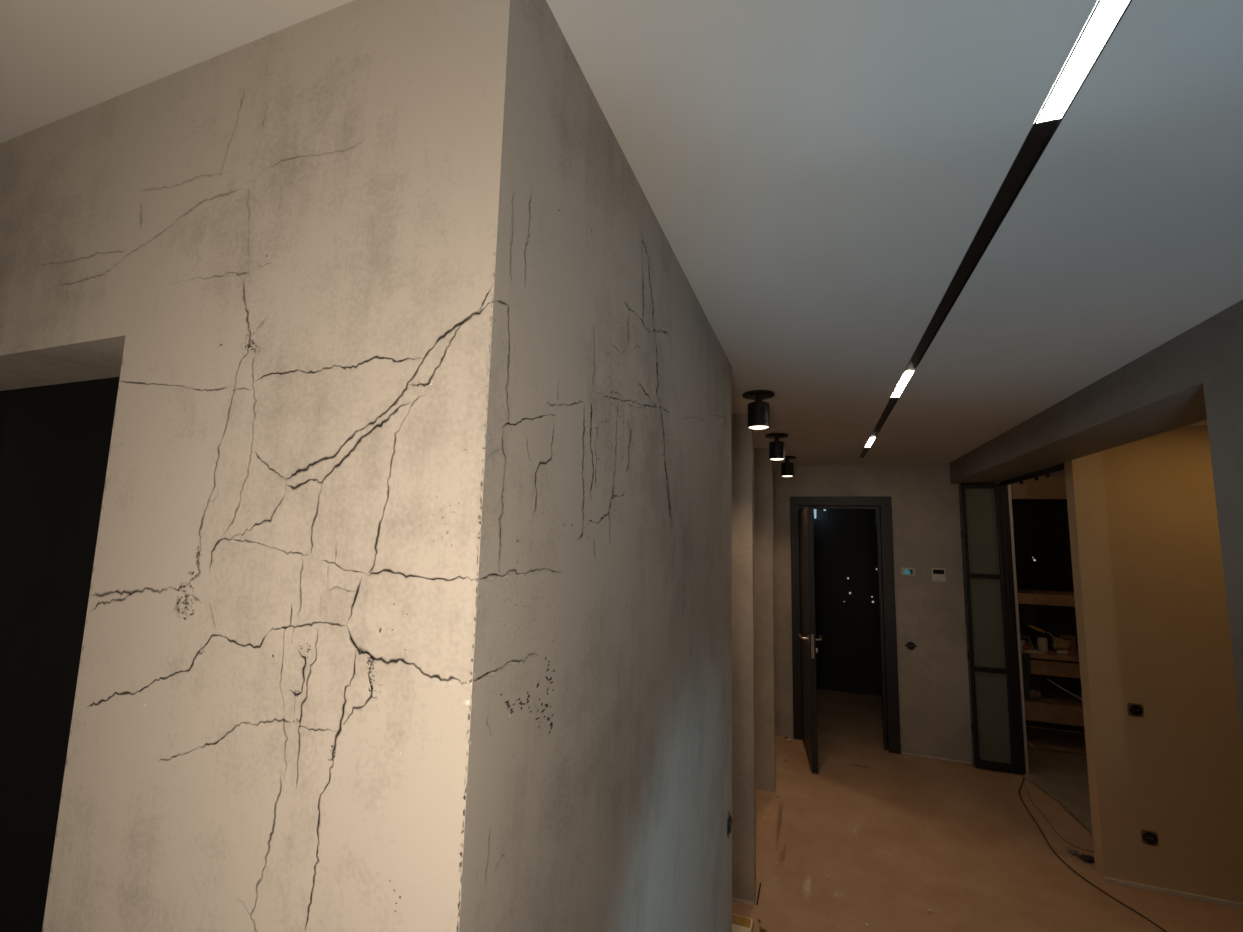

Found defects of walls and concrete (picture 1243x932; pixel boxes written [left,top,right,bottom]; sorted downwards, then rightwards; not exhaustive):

crack [89,242,670,932]